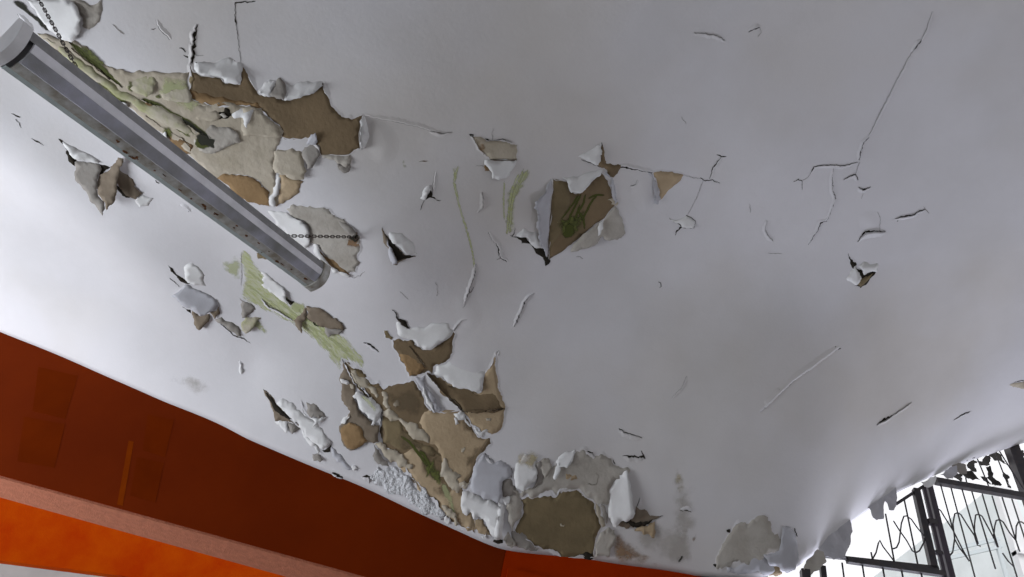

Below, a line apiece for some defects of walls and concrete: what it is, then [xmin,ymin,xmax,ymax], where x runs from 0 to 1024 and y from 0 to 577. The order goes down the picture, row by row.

peeling [59,139,153,216]
peeling [187,58,369,278]
peeling [469,131,519,180]
peeling [512,143,685,266]
crack [794,11,934,245]
peeling [169,263,260,343]
peeling [261,272,345,337]
peeling [382,229,417,265]
peeling [846,255,878,288]
peeling [263,310,661,560]
crack [877,402,912,426]
peeling [713,513,853,576]